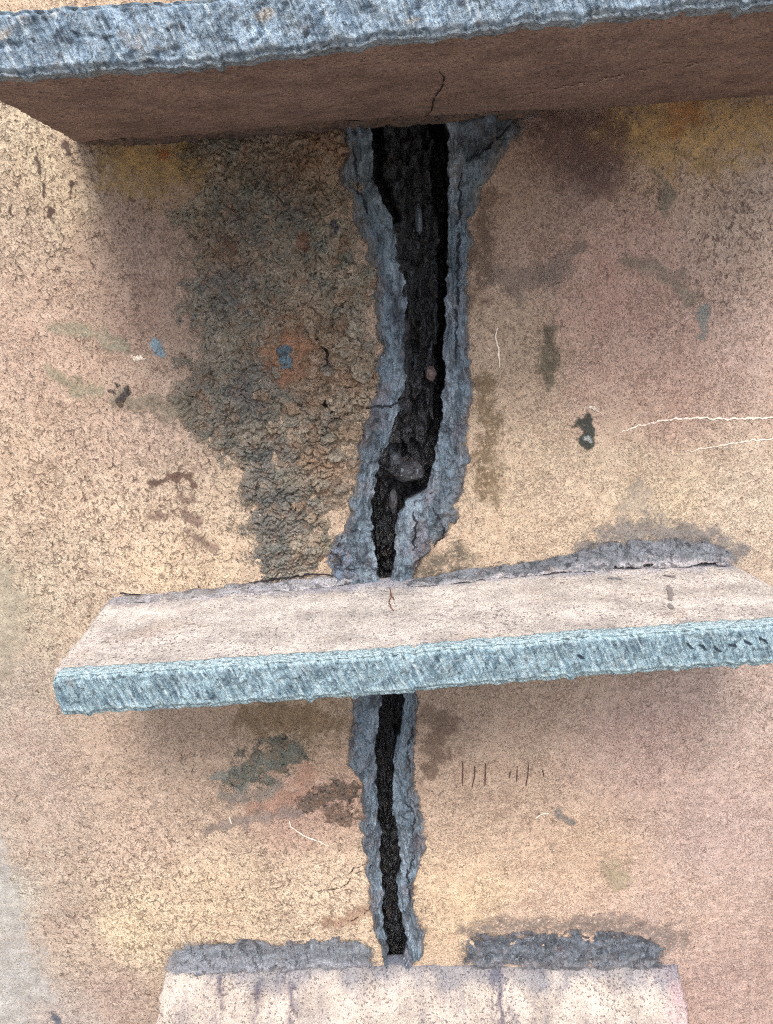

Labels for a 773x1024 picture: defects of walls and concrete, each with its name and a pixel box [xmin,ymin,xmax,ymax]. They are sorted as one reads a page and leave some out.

crack [247,71,540,611]
crack [315,691,428,971]